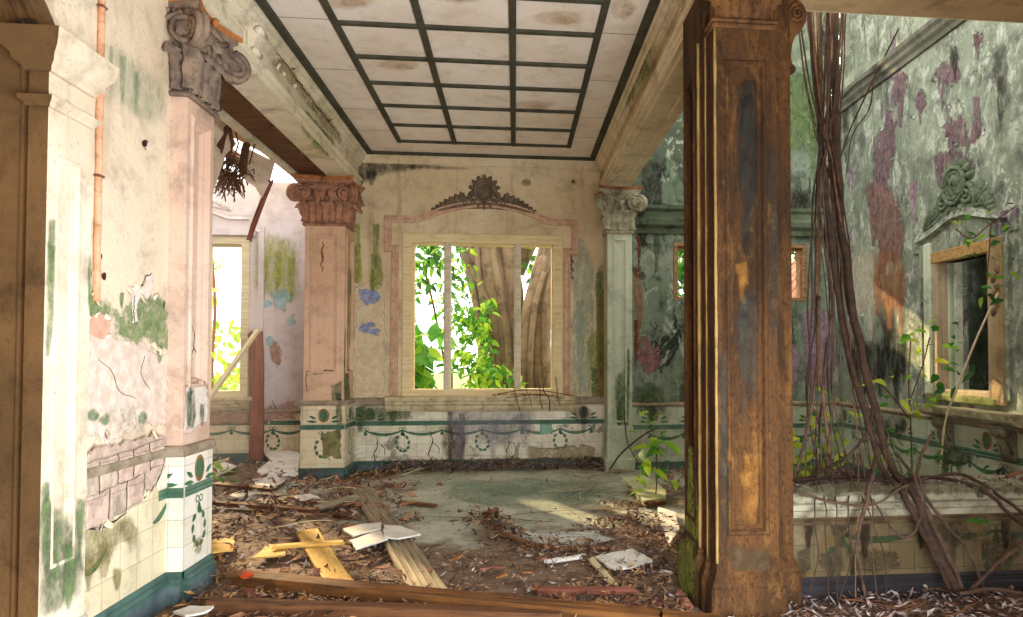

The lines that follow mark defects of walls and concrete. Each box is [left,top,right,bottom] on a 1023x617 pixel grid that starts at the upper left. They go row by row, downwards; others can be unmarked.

peeling [973,30,983,60]
damp [359,163,422,183]
peeling [852,69,927,340]
peeling [931,59,1006,187]
peeling [127,273,153,323]
peeling [266,336,282,369]
peeling [353,280,387,398]
damp [850,301,906,401]
flaking render [86,311,170,533]